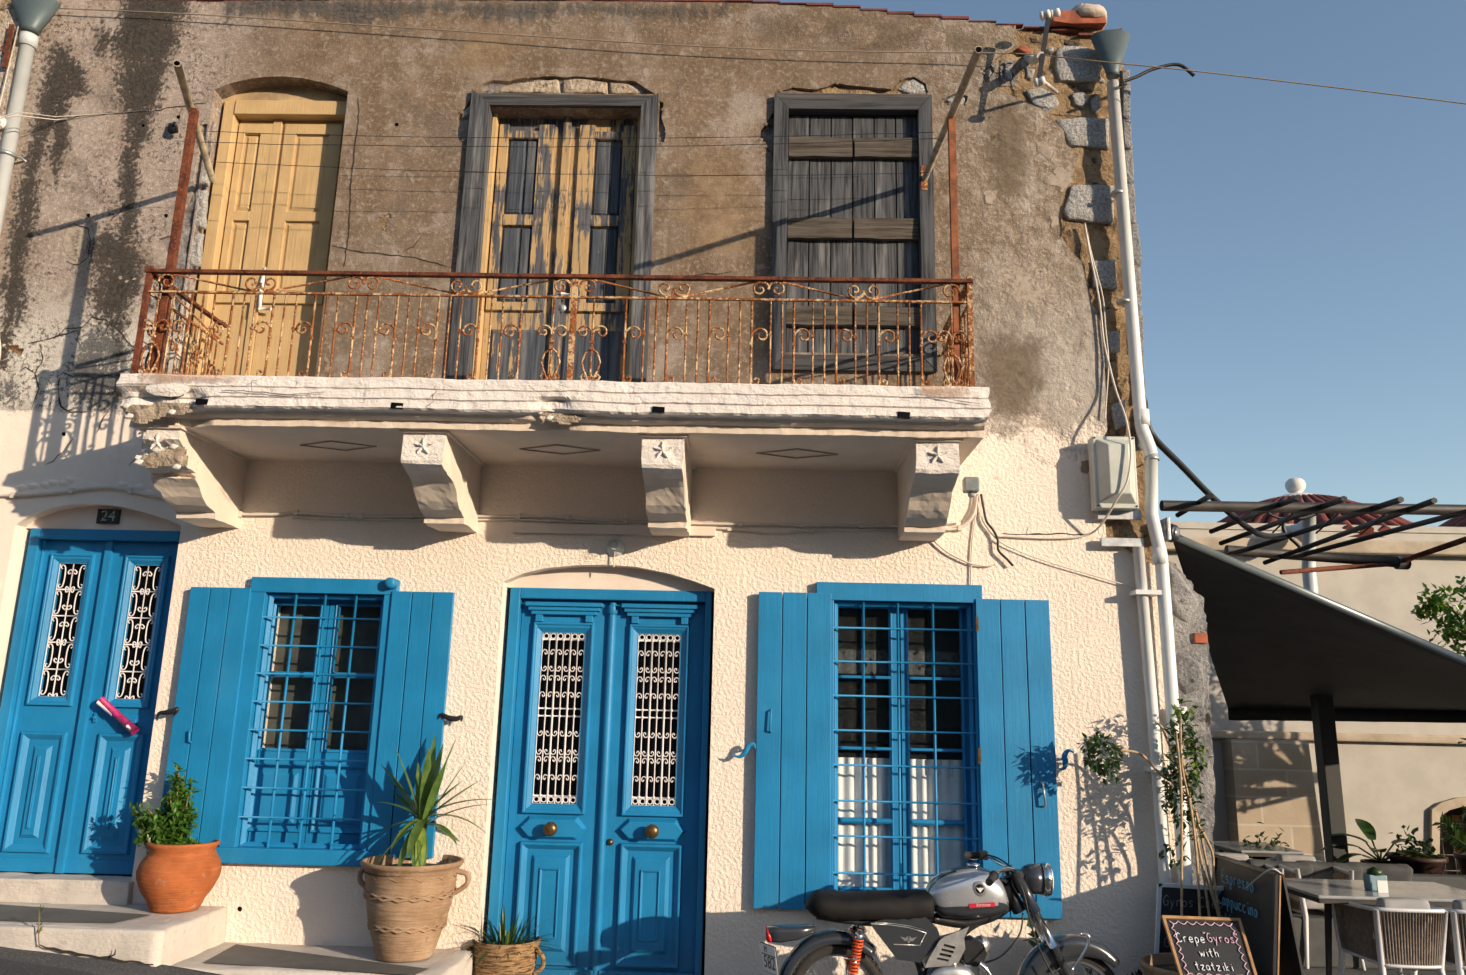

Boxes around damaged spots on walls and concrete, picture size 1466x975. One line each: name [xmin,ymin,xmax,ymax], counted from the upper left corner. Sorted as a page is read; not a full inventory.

spalling [452,76,669,144]
spalling [758,110,774,155]
spalling [777,79,969,106]
leakage [0,0,191,416]
spalling [981,28,1152,564]
rust [921,386,966,394]